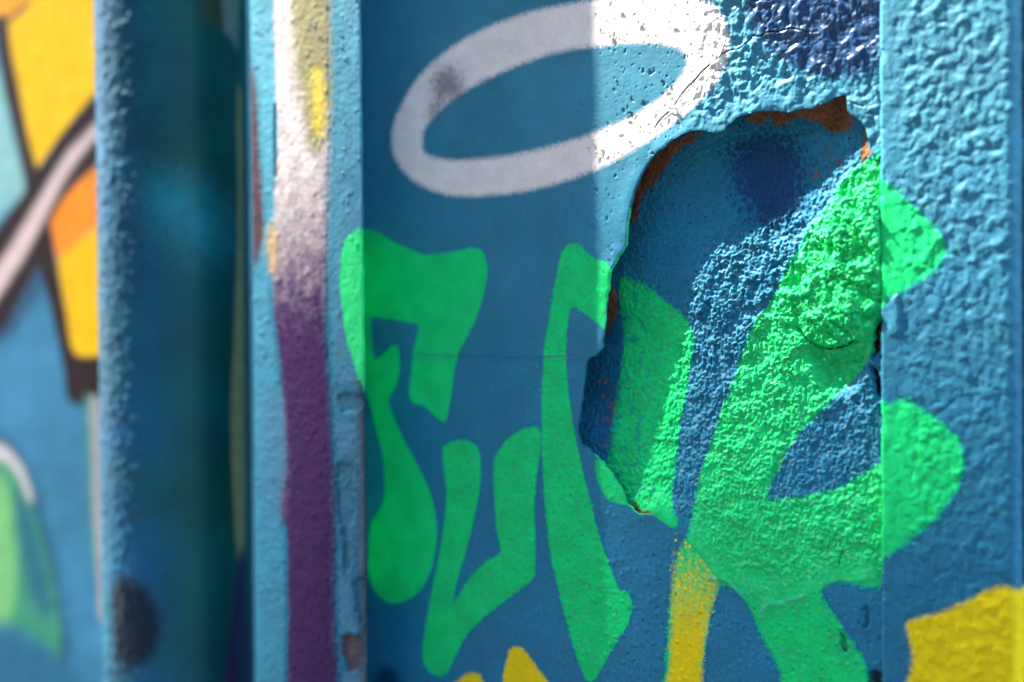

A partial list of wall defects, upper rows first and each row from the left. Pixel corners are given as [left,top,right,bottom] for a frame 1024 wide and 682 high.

crack [656,28,814,126]
flaking render [577,94,903,603]
crack [803,334,855,350]